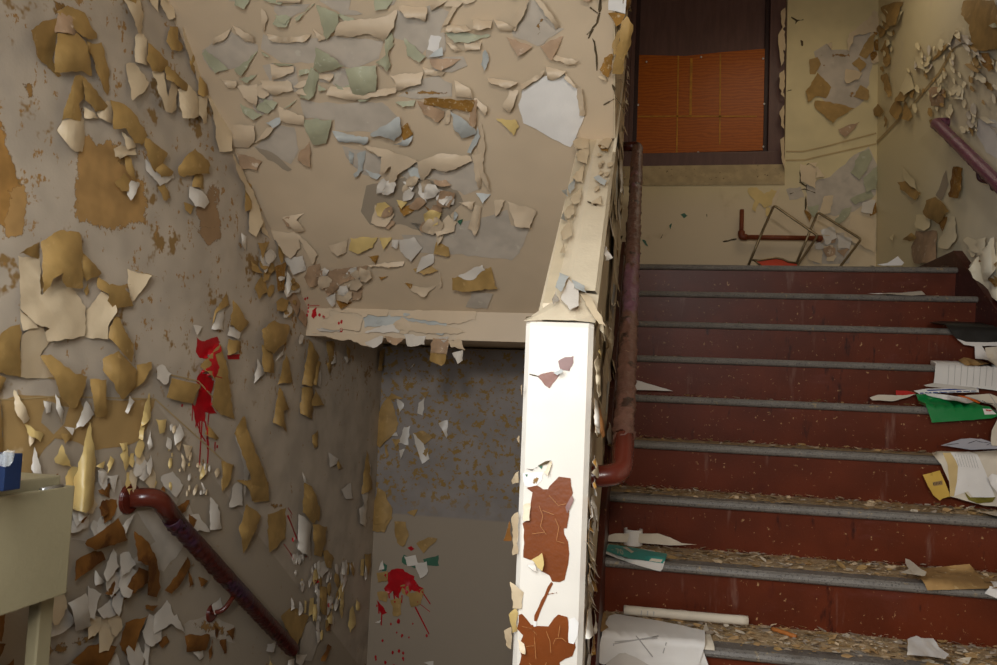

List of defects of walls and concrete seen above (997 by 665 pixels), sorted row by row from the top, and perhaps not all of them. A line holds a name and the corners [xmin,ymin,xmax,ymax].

peeling [598,0,633,116]
peeling [805,0,997,159]
peeling [31,0,627,447]
peeling [0,230,439,665]
peeling [959,357,989,366]
peeling [503,455,997,665]